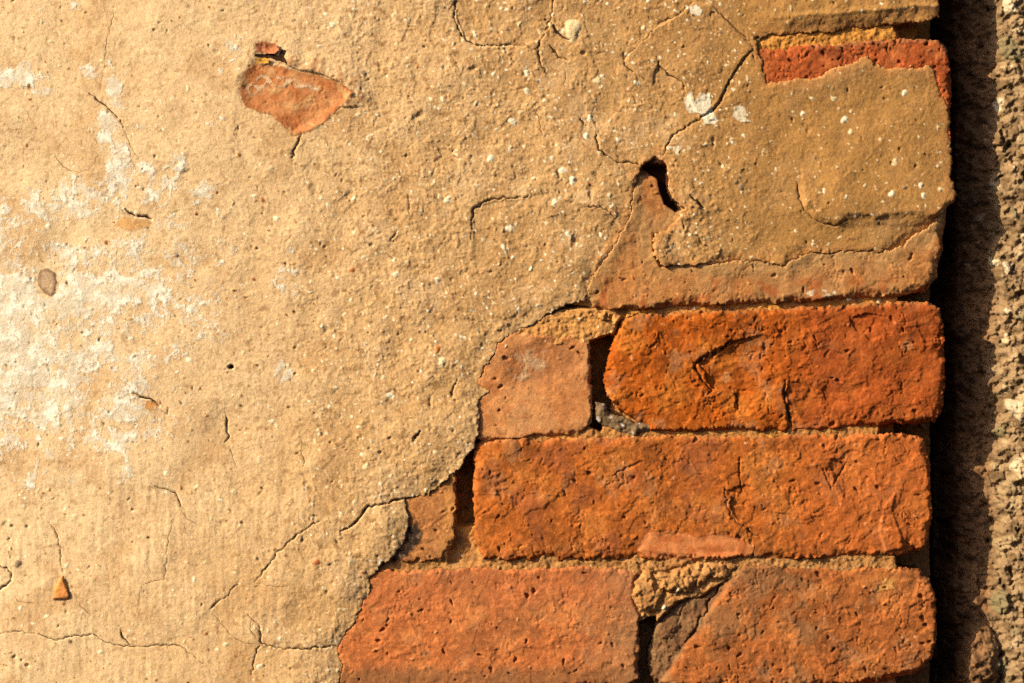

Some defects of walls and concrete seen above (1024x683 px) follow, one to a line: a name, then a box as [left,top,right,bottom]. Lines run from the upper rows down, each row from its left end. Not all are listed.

spalling [219,35,353,135]
crack [454,0,570,87]
crack [624,2,694,93]
crack [663,14,749,155]
crack [578,116,636,164]
crack [471,195,529,221]
crack [139,489,194,597]
crack [342,498,406,531]
spalling [637,531,754,560]
crack [1,606,196,658]
crack [212,526,330,675]